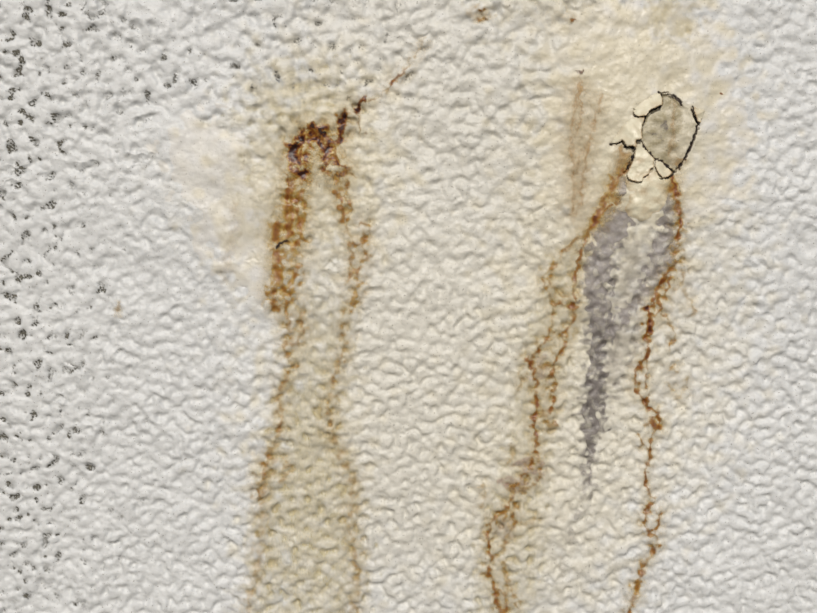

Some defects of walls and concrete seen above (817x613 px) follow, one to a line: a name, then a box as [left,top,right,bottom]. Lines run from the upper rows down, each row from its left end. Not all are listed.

rust [257,448,279,512]
rust [265,96,370,411]
rust [483,160,633,613]
rust [569,70,593,196]
rust [628,175,684,613]
peeling [609,91,705,221]